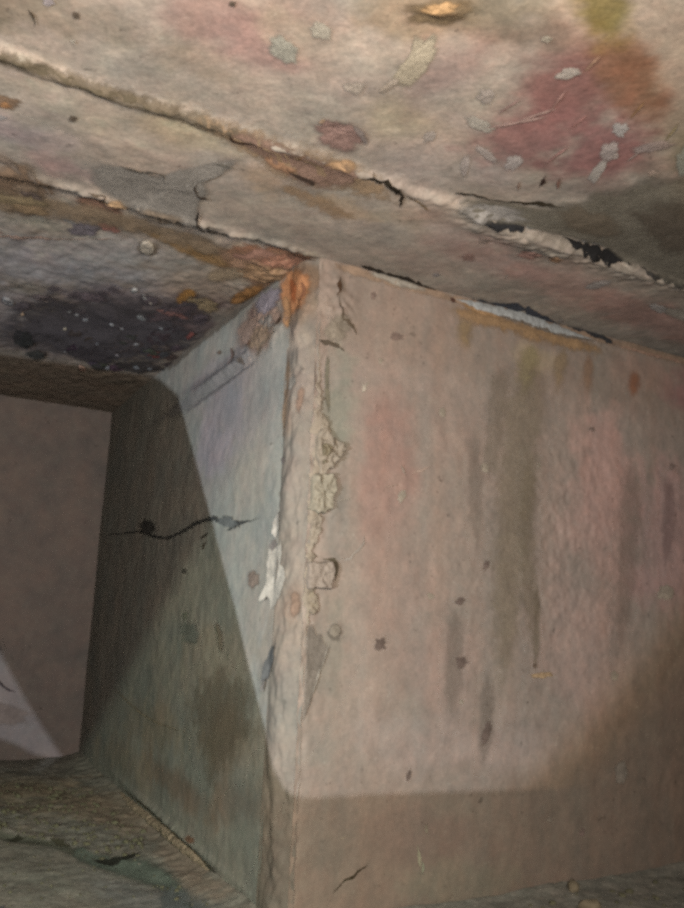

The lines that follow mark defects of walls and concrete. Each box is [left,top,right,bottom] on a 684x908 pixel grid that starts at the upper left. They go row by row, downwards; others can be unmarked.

corrosion [409,0,472,25]
corrosion [0,95,20,110]
peeling [93,161,234,238]
crack [358,174,429,211]
crack [456,176,684,290]
corrosion [0,156,314,369]
crack [101,515,259,550]
peeling [259,513,285,609]
crack [333,866,366,893]